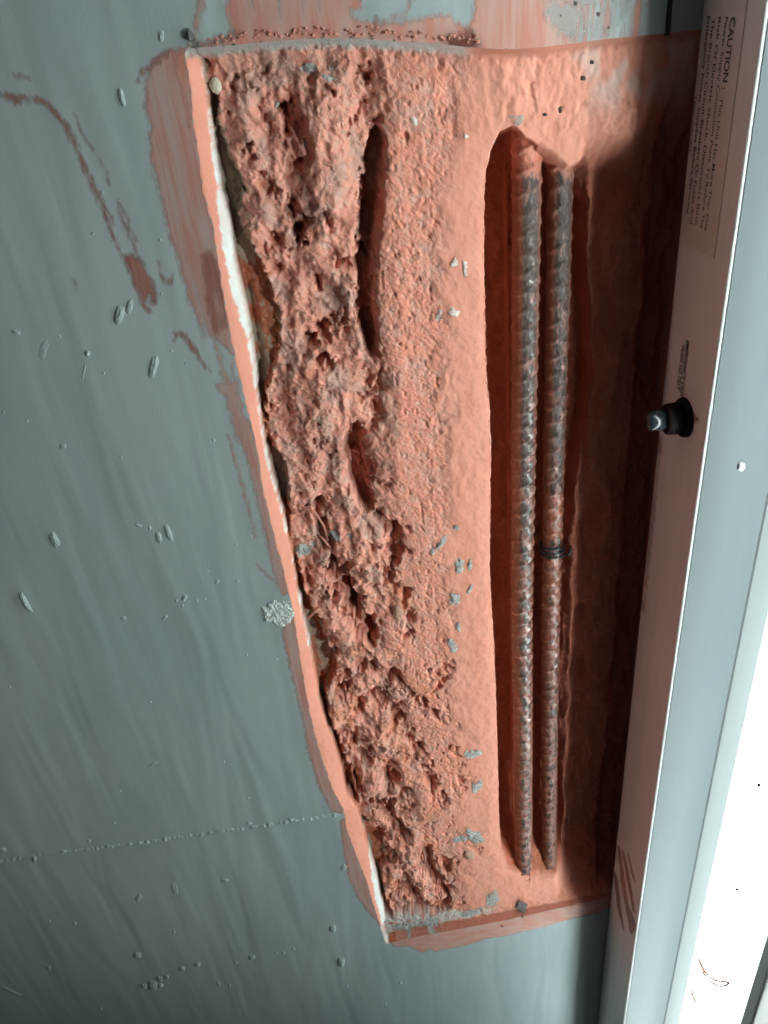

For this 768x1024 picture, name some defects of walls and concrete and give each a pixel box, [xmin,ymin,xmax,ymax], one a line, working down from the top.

spalling [185,28,701,944]